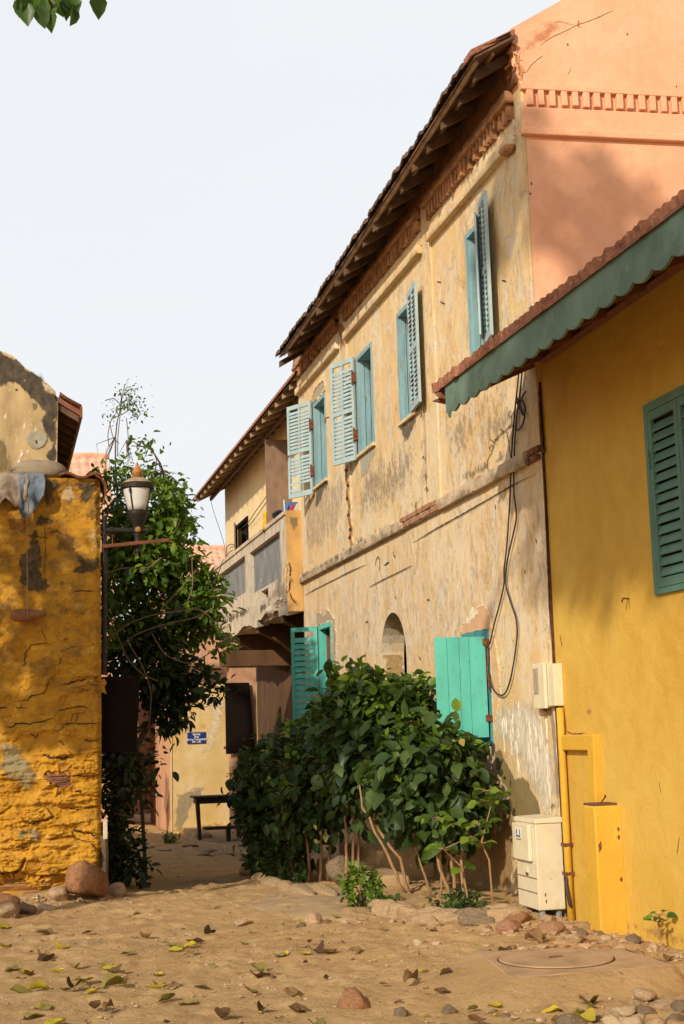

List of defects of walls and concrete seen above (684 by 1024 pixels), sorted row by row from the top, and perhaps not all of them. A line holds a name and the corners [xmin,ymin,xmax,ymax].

crack [520,10,612,73]
crack [288,378,562,646]
spalling [0,743,79,796]
crack [0,632,100,878]
leakage [434,710,559,890]
peeling [460,604,558,815]